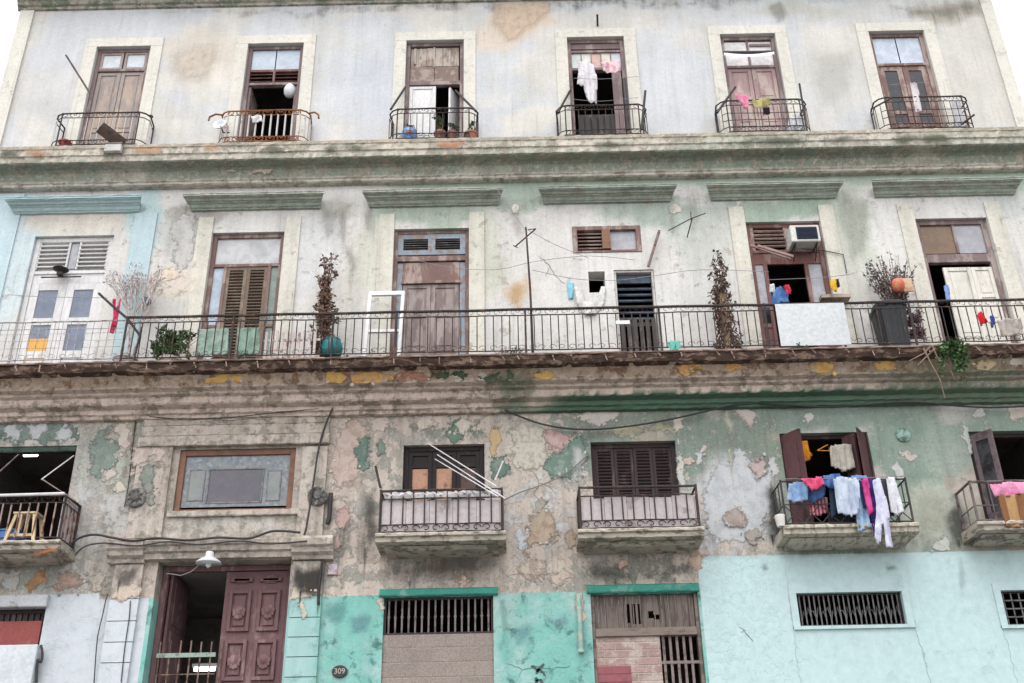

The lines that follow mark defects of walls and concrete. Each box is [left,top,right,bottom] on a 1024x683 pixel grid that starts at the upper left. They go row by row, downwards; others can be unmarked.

peeling [151,212,199,289]
peeling [326,370,514,396]
spalling [534,370,555,380]
spalling [676,365,701,376]
peeling [0,422,166,506]
peeling [327,417,391,489]
peeling [486,409,780,582]
peeling [1,570,143,603]